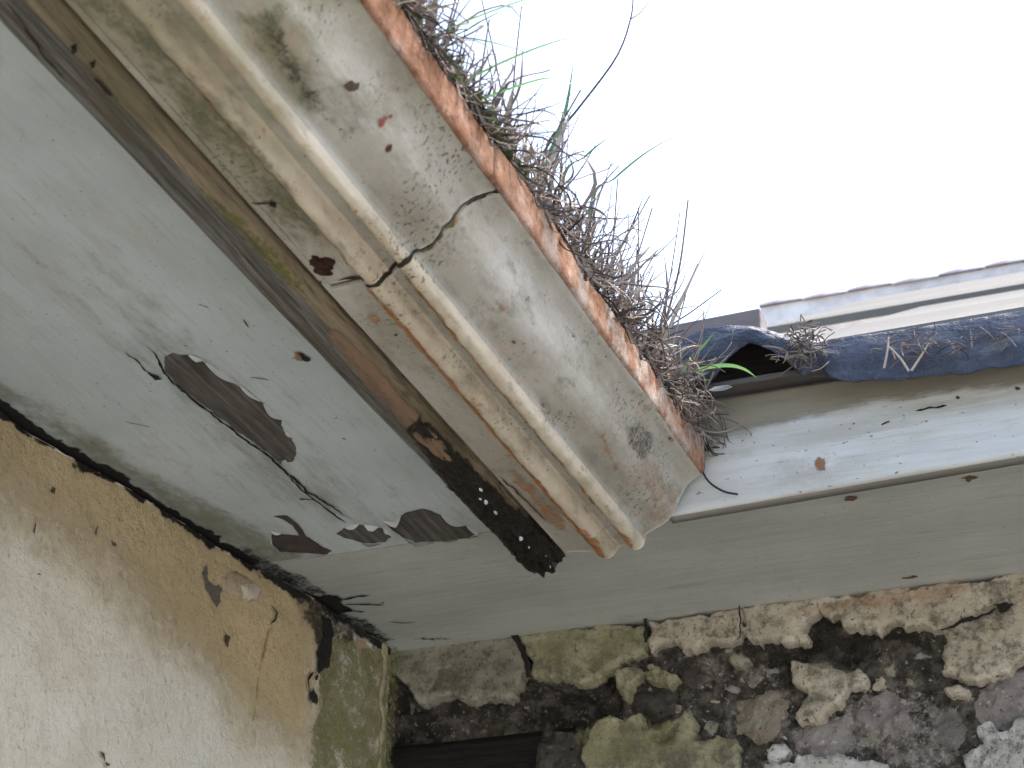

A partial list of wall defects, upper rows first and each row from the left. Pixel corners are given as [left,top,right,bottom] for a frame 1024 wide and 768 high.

corrosion [158,48,353,276]
crack [338,191,499,288]
peeling [164,353,297,464]
corrosion [365,271,604,558]
peeling [270,516,331,558]
peeling [336,509,480,547]
water stain [0,399,391,734]
spalling [202,566,261,607]
peeling [711,666,782,703]
peeling [872,661,916,705]
peeling [704,720,719,734]